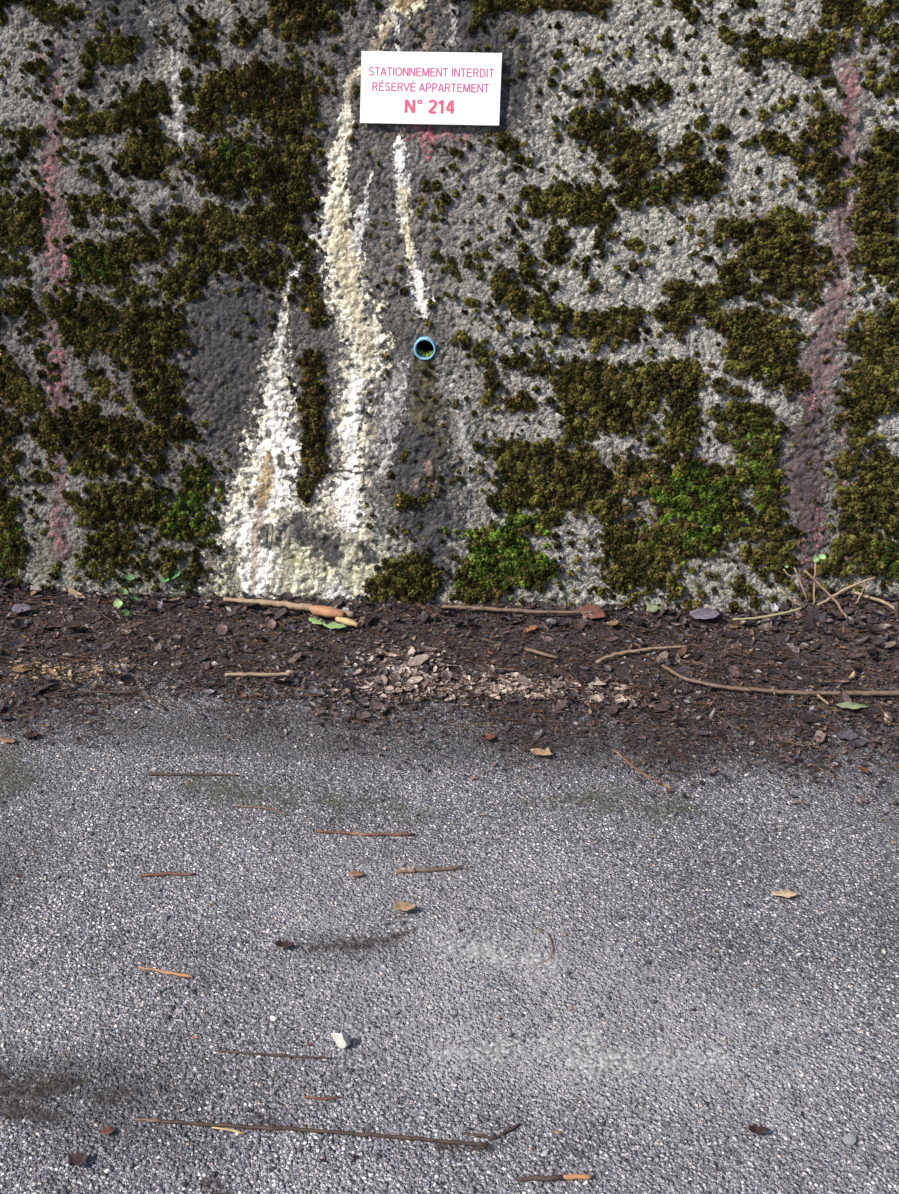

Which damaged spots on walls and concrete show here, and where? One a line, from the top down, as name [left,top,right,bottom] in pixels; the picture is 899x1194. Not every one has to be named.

water stain [71,0,188,152]
water stain [371,0,548,145]
water stain [165,67,494,614]